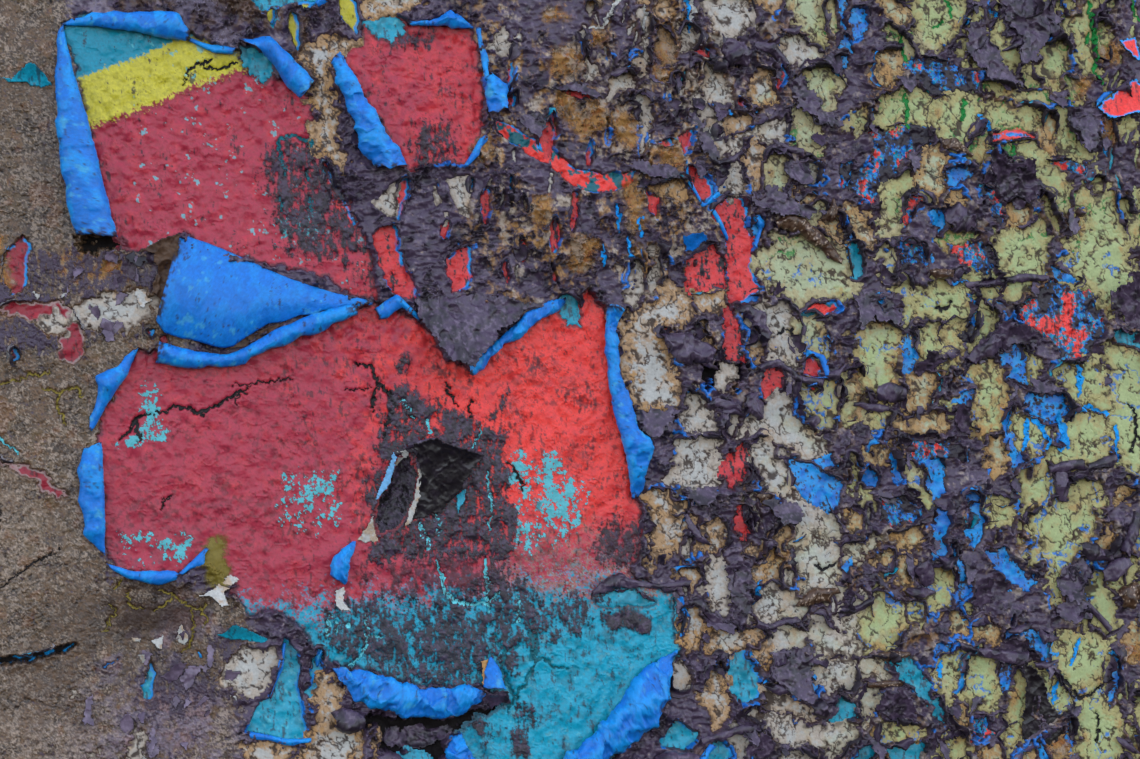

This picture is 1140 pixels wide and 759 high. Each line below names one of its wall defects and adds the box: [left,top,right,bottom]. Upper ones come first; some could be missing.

peeling [1119,37,1140,61]
peeling [746,63,783,107]
peeling [629,88,656,154]
peeling [1095,73,1140,149]
peeling [711,209,728,241]
peeling [744,214,765,249]
crack [119,377,293,444]
peeling [1112,475,1140,508]
peeling [983,543,1038,592]
peeling [1120,617,1140,648]
peeling [1014,740,1037,759]
peeling [1036,738,1052,759]